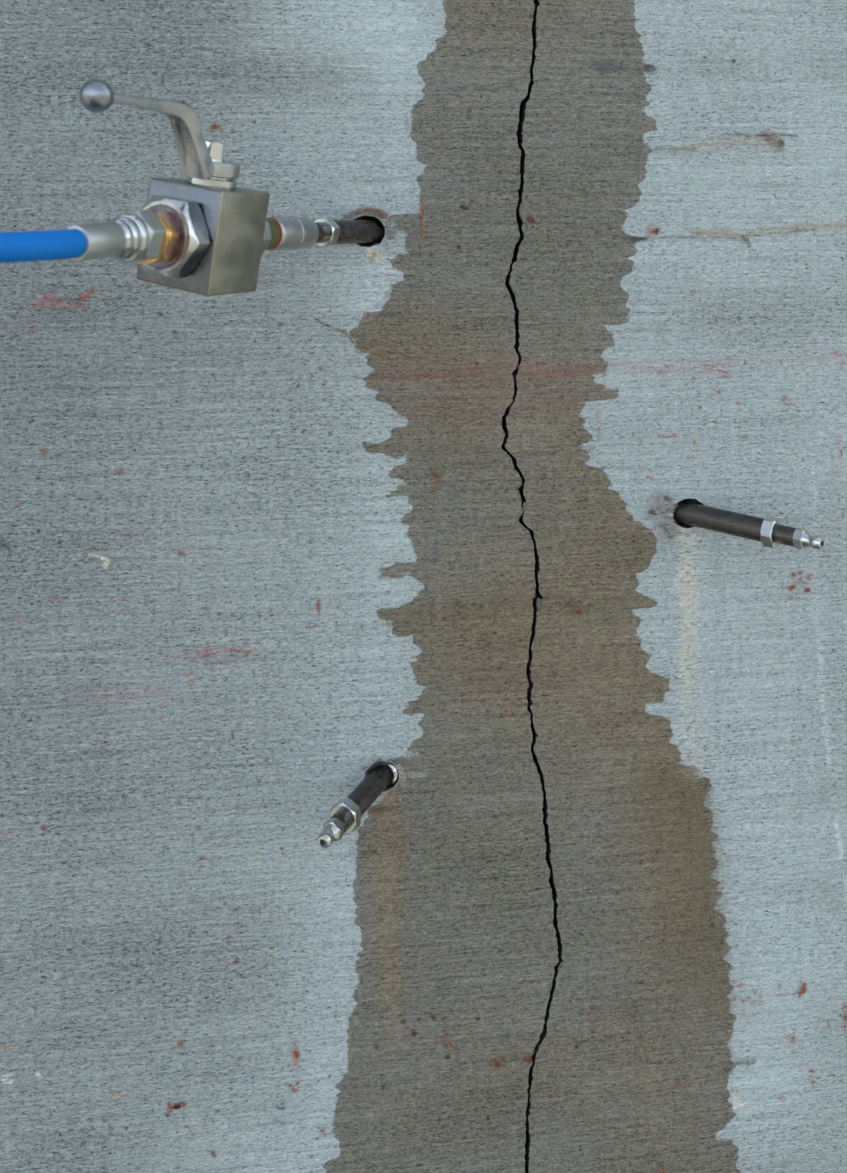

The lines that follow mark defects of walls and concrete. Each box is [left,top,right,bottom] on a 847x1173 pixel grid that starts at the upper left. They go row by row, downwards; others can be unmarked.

crack [501,0,563,1173]
leakage [323,0,753,1173]